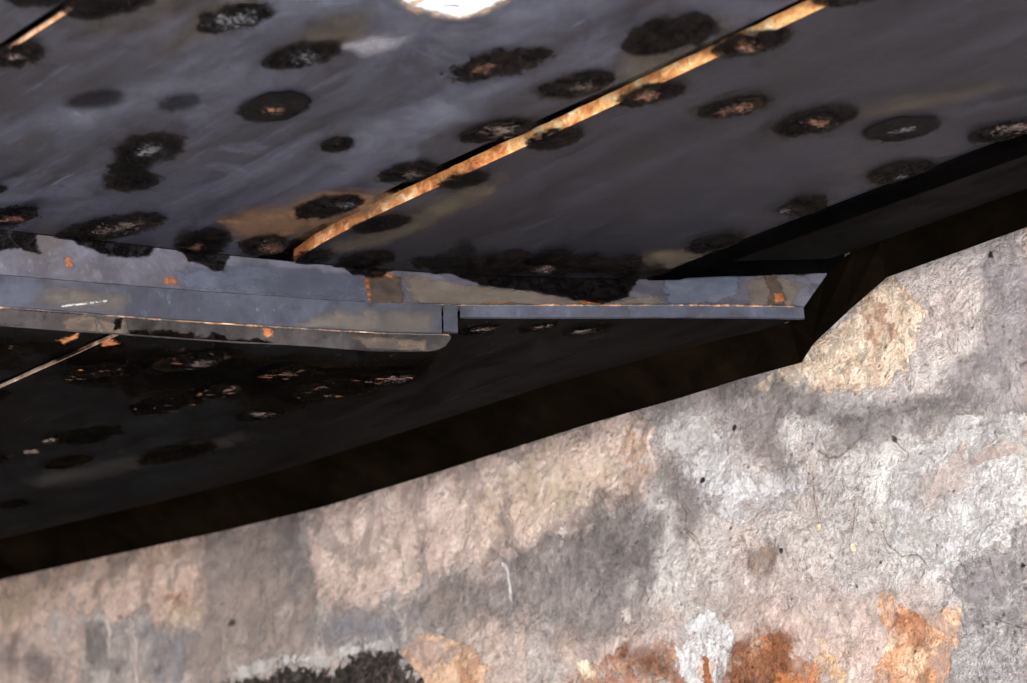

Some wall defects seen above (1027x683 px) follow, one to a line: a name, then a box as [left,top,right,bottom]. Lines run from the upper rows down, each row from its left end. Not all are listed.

rust [633,88,659,102]
rust [718,99,759,116]
rust [223,194,394,254]
rust [346,187,493,247]
rust [44,290,128,346]
rust [298,274,428,351]
rust [765,275,787,306]
rust [557,592,962,683]